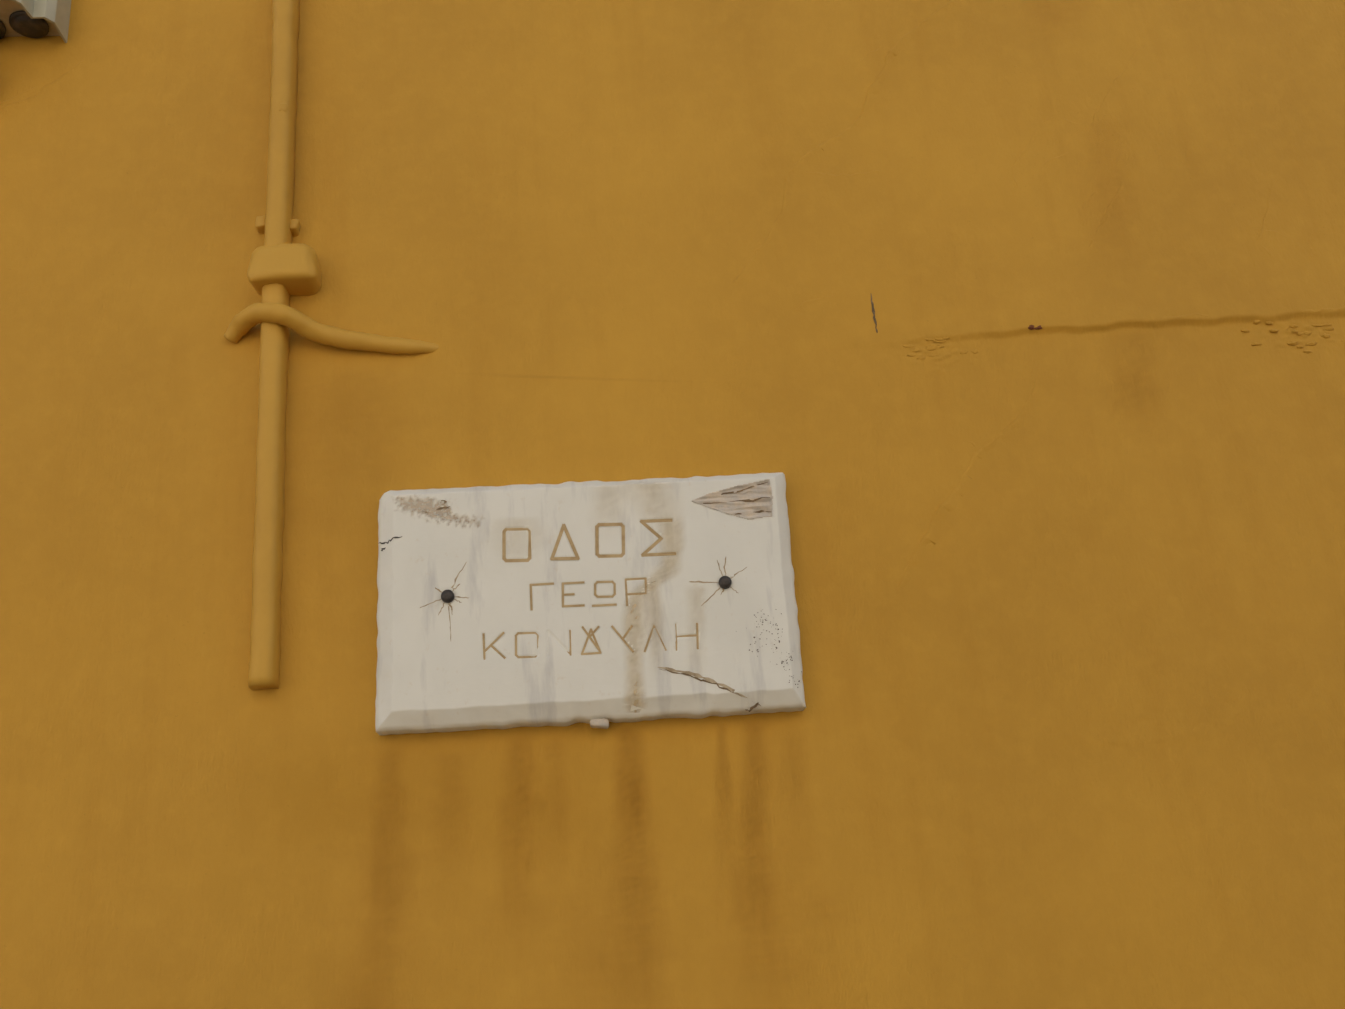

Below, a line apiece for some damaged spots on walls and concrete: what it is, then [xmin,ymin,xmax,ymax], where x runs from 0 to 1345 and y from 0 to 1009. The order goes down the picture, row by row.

spalling [692,479,773,520]